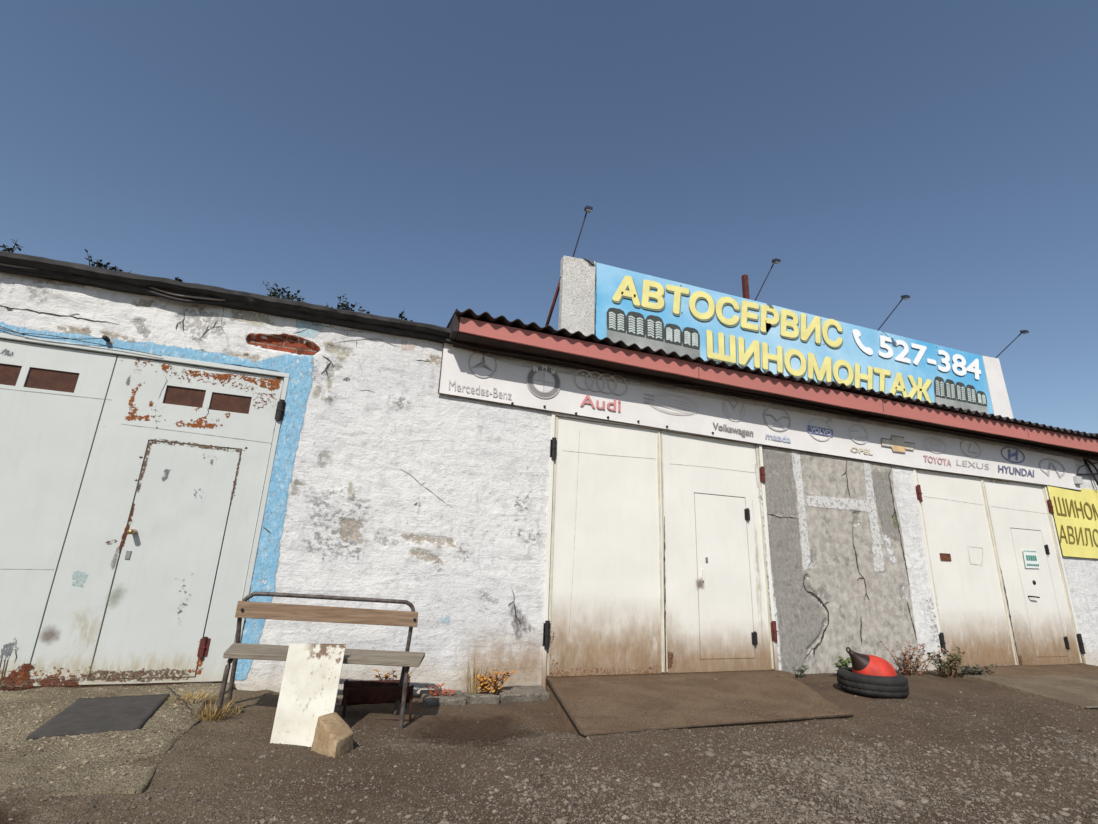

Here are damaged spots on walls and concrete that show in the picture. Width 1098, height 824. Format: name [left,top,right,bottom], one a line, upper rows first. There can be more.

flaking render [176,306,326,380]
corrosion [174,407,231,429]
corrosion [125,358,282,421]
corrosion [135,439,247,499]
corrosion [107,504,135,553]
peeling [304,492,455,563]
crack [803,572,829,659]
peeling [755,444,921,675]
crack [853,537,869,645]
crack [889,467,917,640]
corrosion [0,648,204,690]